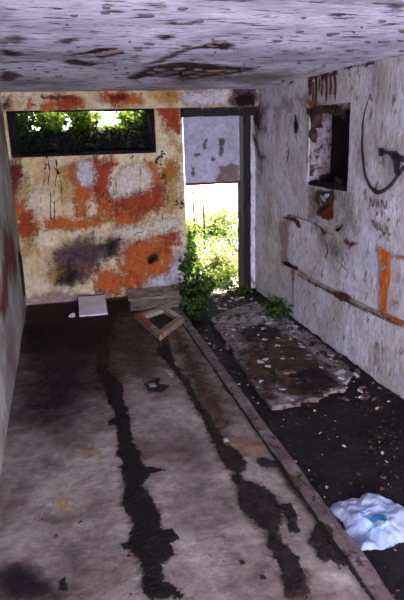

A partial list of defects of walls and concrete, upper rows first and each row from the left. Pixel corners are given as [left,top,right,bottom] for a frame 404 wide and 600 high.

peeling [60,36,260,83]
corrosion [99,90,143,108]
corrosion [276,70,337,122]
flaking render [307,103,348,143]
flaking render [308,174,347,221]
corrosion [0,154,183,321]
corrosion [378,246,404,327]
water stain [13,232,264,455]